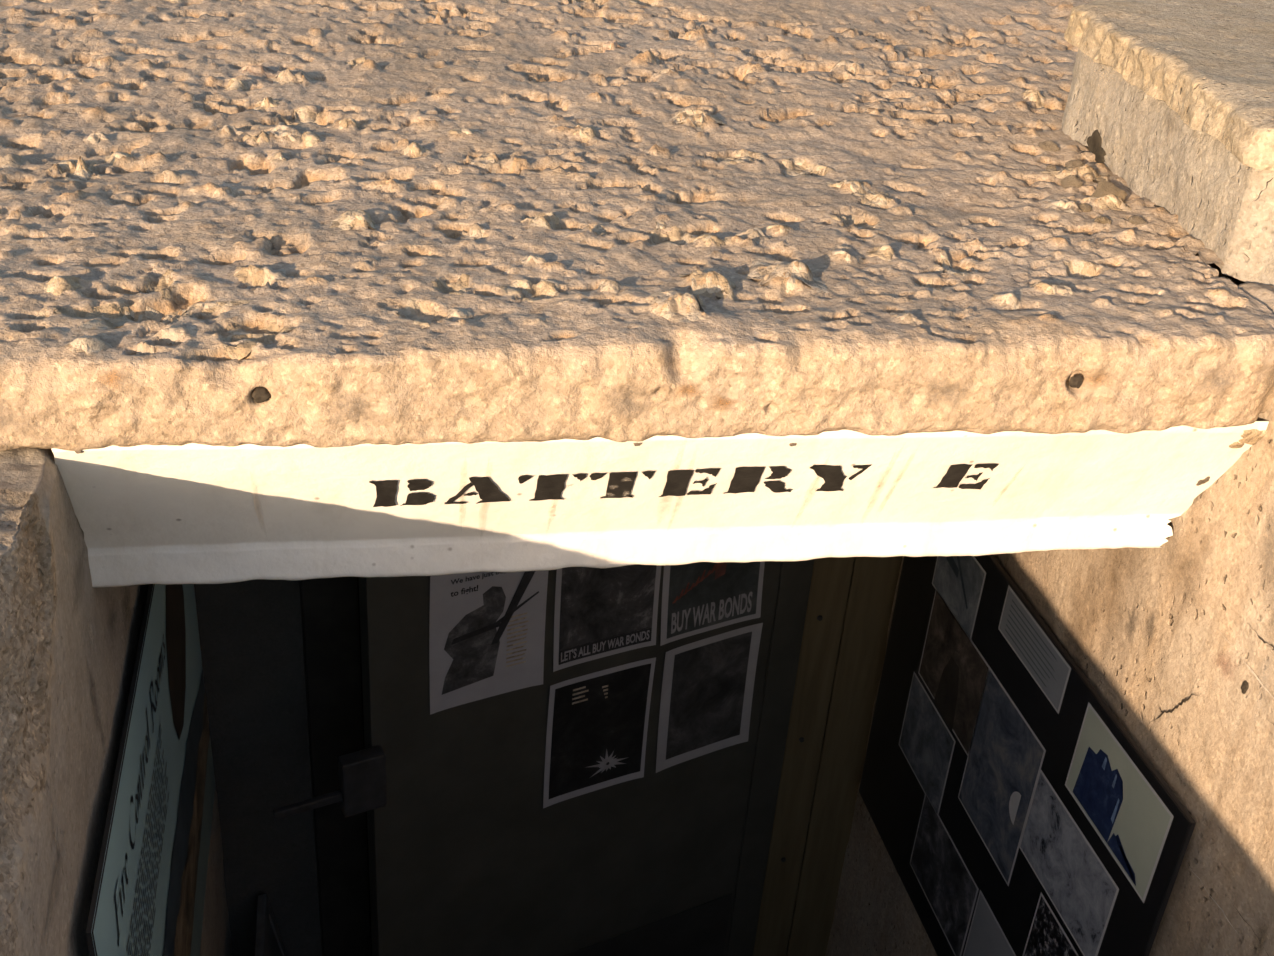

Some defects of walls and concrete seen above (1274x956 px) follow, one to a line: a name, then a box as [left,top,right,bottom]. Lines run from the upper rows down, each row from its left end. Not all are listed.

crack [1149,694,1200,724]